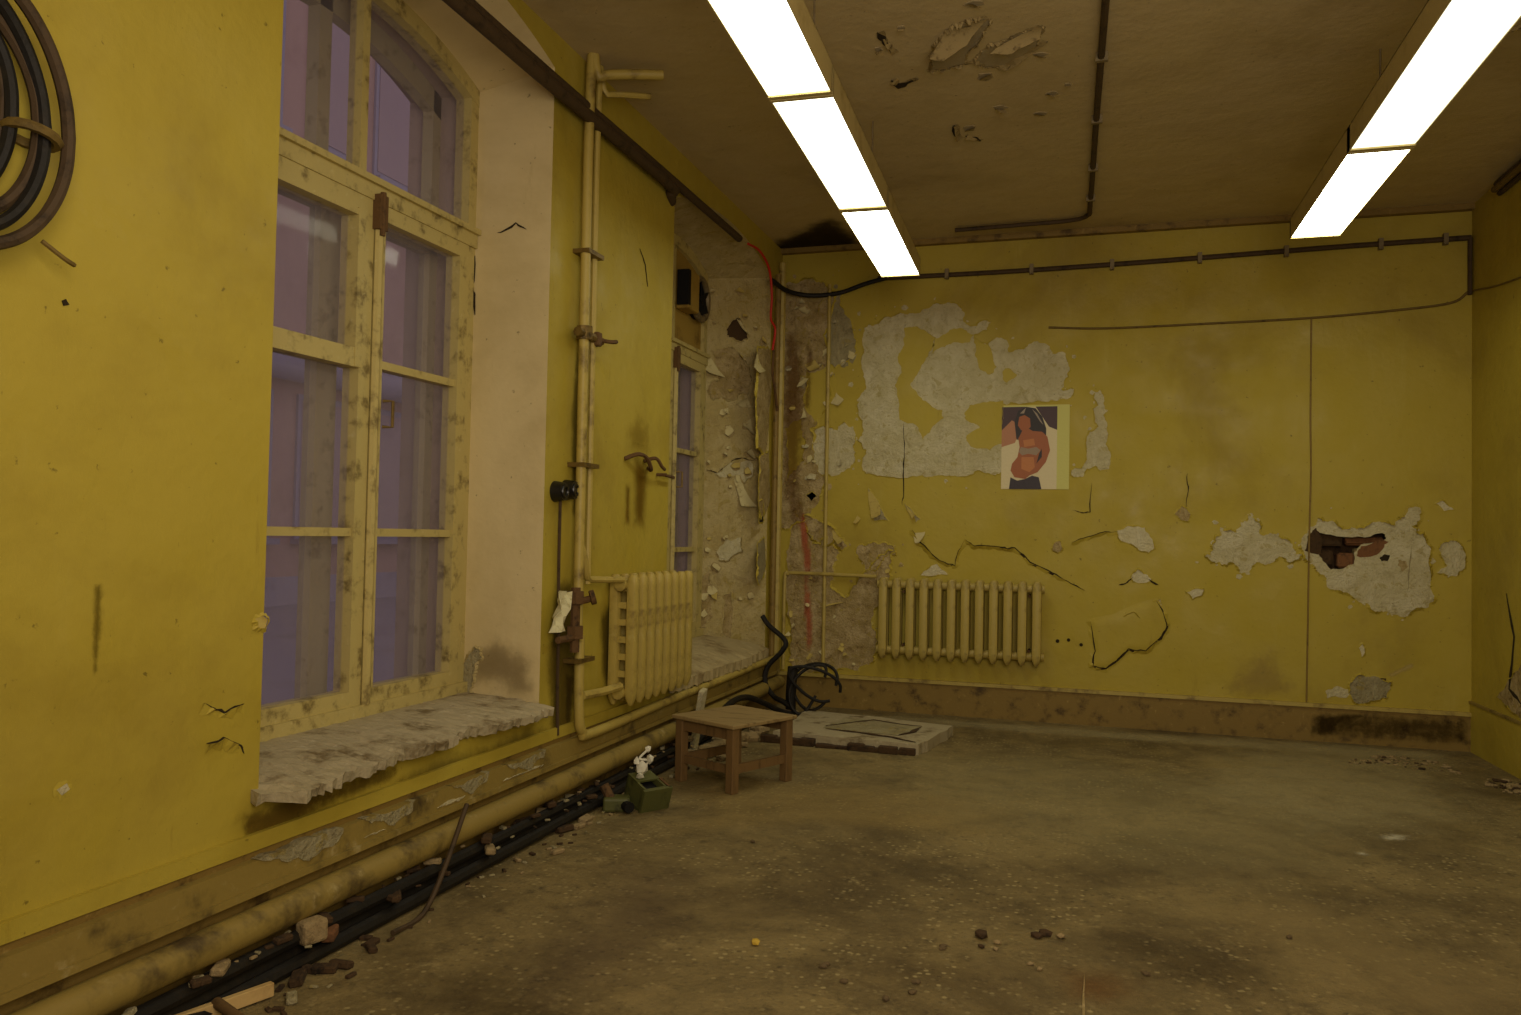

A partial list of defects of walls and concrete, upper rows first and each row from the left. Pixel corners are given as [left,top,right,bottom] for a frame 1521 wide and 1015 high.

peeling [875,26,905,55]
peeling [891,0,1048,89]
peeling [701,270,1113,673]
crack [902,426,1170,673]
spalling [1195,499,1467,621]
spalling [1326,642,1393,706]
spalling [438,749,546,808]